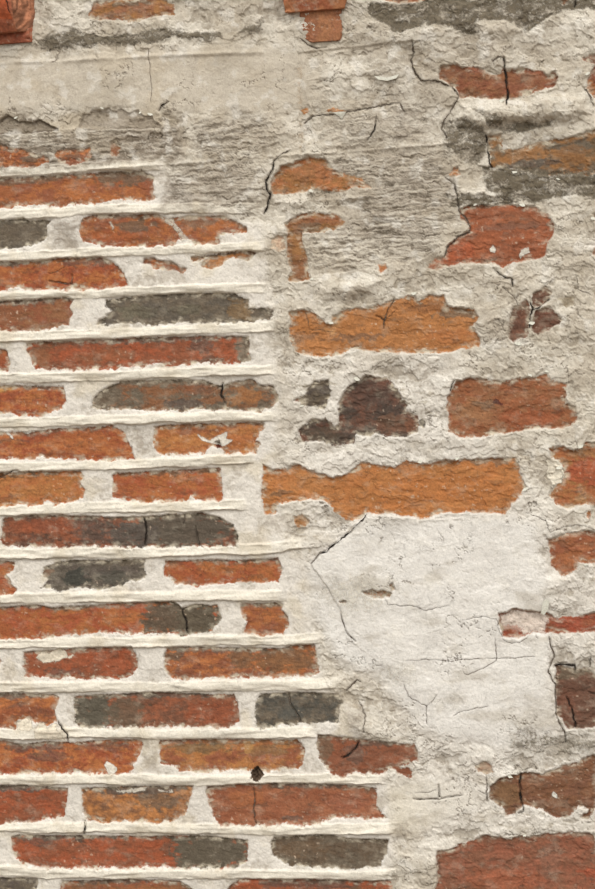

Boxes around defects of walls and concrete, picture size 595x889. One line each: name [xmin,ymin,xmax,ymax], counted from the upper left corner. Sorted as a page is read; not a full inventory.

spalling [0,112,60,137]
crack [304,103,404,137]
crack [410,40,459,138]
crack [264,151,288,213]
spalling [267,153,375,198]
spalling [270,209,349,287]
spalling [423,201,558,274]
spalling [285,292,484,361]
spalling [291,373,426,449]
spalling [257,453,530,528]
spalling [363,583,396,599]
spalling [432,750,595,889]